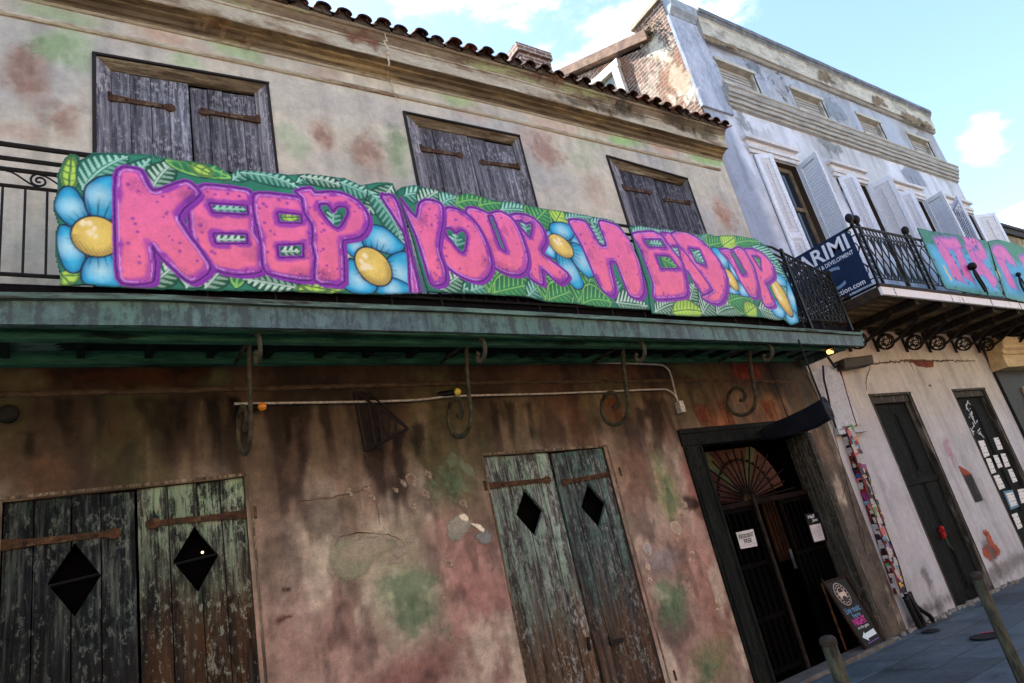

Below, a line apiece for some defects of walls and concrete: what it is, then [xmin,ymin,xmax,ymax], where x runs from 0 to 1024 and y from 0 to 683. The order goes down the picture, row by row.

flaking render [647,36,695,104]
leakage [285,404,330,458]
leakage [366,424,423,486]
leakage [637,400,664,441]
flaking render [447,500,491,543]
leakage [684,497,700,510]
flaking render [329,531,413,579]